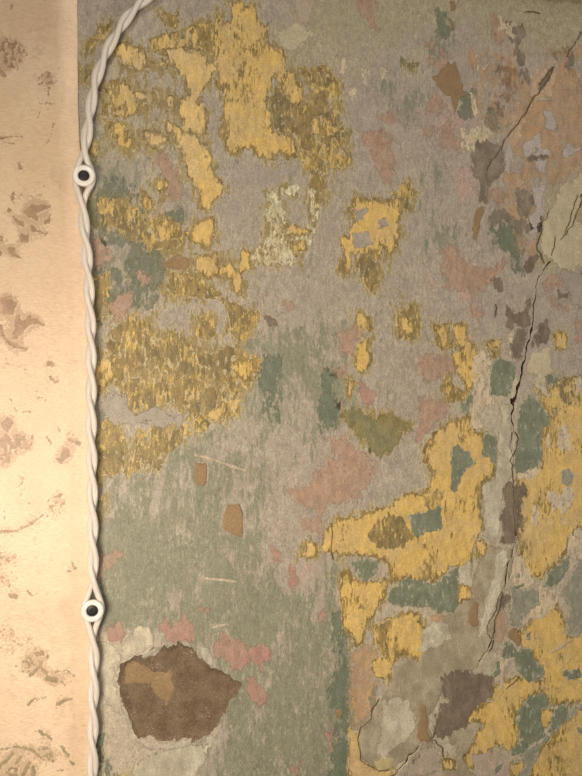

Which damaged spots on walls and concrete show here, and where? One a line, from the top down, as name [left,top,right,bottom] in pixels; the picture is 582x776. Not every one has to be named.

peeling [432,62,479,118]
flaking render [497,14,554,89]
crack [487,31,582,169]
flaking render [470,139,534,240]
peeling [83,0,357,521]
peeling [316,311,374,433]
crack [479,194,582,661]
peeling [499,373,582,590]
peeling [300,415,496,776]
flaking render [117,641,268,751]
crack [357,699,454,776]
peeling [417,603,582,776]